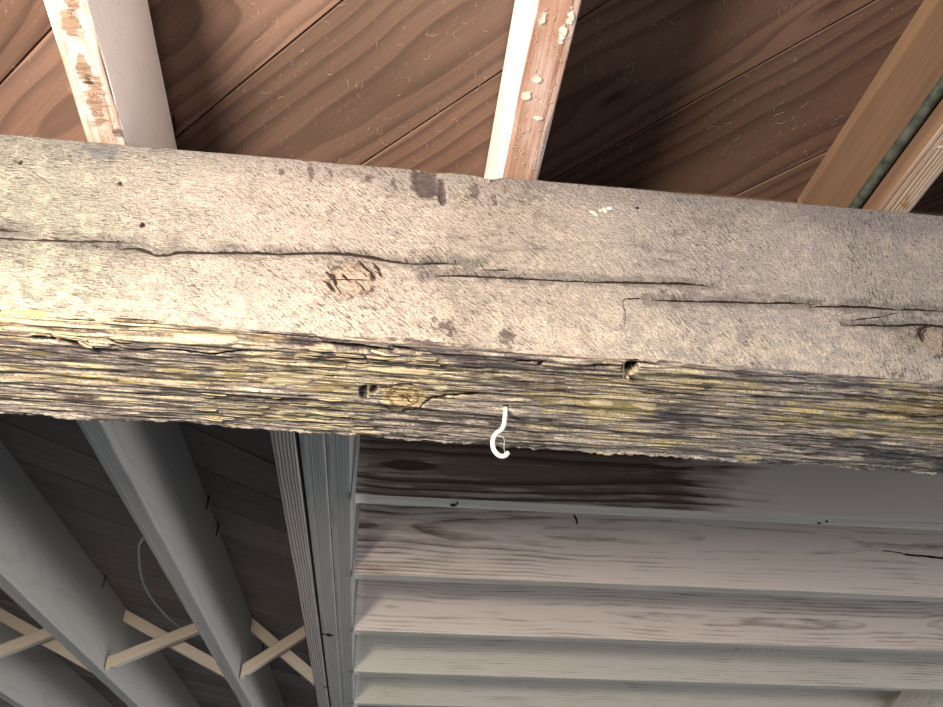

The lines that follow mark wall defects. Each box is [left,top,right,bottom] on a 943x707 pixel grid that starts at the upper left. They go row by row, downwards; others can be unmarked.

peeling [59,0,81,36]
peeling [74,54,123,136]
crack [0,228,943,346]
water stain [387,316,467,347]
water stain [499,329,516,349]
water stain [24,372,143,384]
water stain [155,365,197,376]
water stain [337,359,451,371]
water stain [525,396,702,422]
water stain [832,401,943,423]